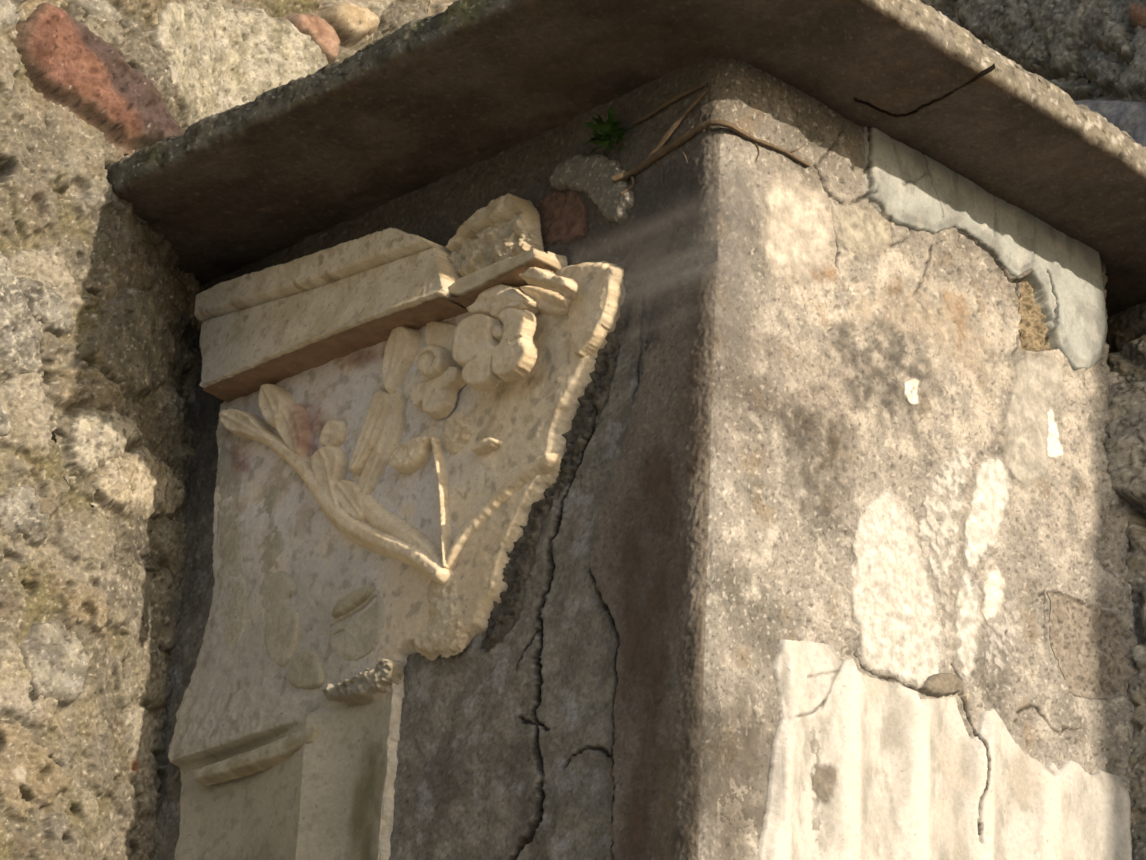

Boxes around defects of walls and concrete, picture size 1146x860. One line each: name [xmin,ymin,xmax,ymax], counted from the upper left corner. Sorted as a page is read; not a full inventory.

crack [814,63,995,247]
crack [958,229,1020,333]
crack [1049,274,1059,320]
spalling [479,331,619,652]
crack [511,426,620,860]
crack [860,664,925,690]
crack [957,675,991,835]
crack [1017,705,1070,733]